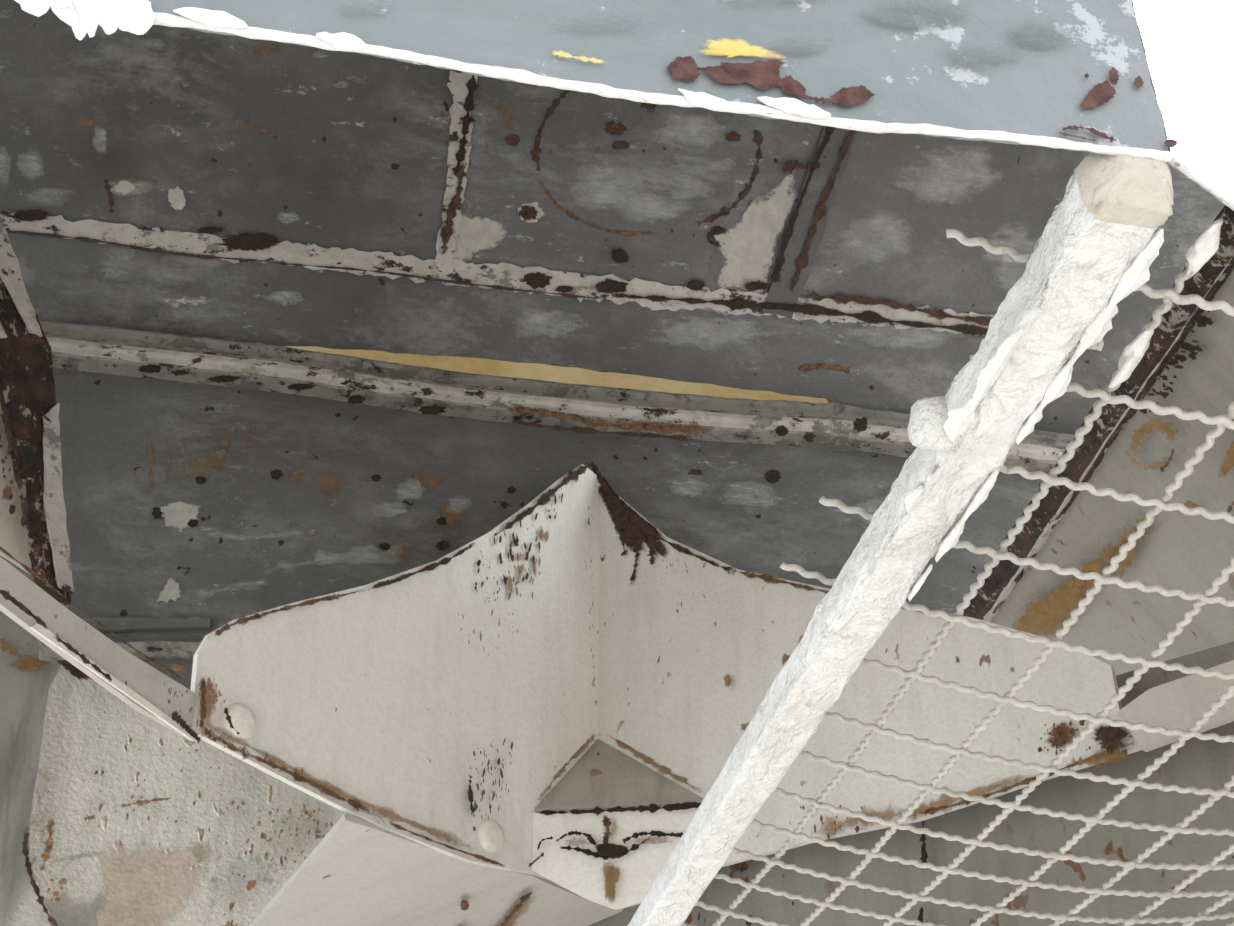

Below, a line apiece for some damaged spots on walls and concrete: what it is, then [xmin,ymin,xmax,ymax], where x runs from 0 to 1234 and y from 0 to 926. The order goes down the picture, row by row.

corrosion [440,75,479,254]
peeling [452,214,508,260]
corrosion [6,126,993,336]
corrosion [502,90,653,263]
peeling [714,174,797,294]
corrosion [1139,311,1213,414]
corrosion [0,384,30,527]
corrosion [215,462,829,655]
corrosion [801,720,1135,839]
corrosion [22,816,67,926]